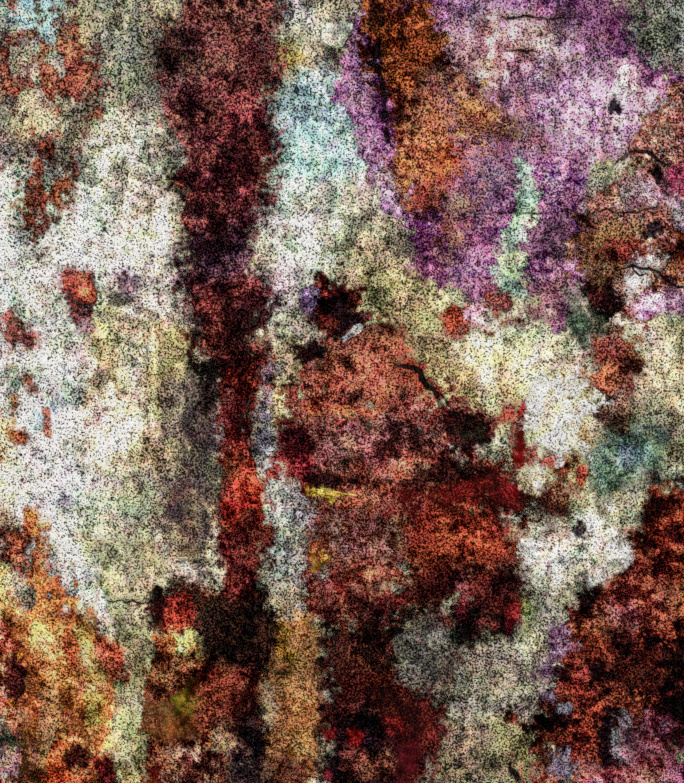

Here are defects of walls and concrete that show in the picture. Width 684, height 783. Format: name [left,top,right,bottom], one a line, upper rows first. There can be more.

rust [0,0,110,137]
rust [414,66,469,131]
rust [11,127,82,259]
rust [430,171,485,267]
rust [149,0,291,603]
rust [437,279,531,342]
rust [0,373,38,461]
rust [41,407,52,438]
rust [494,398,529,449]
rust [527,445,590,520]
rust [0,497,132,783]
rust [136,643,267,783]